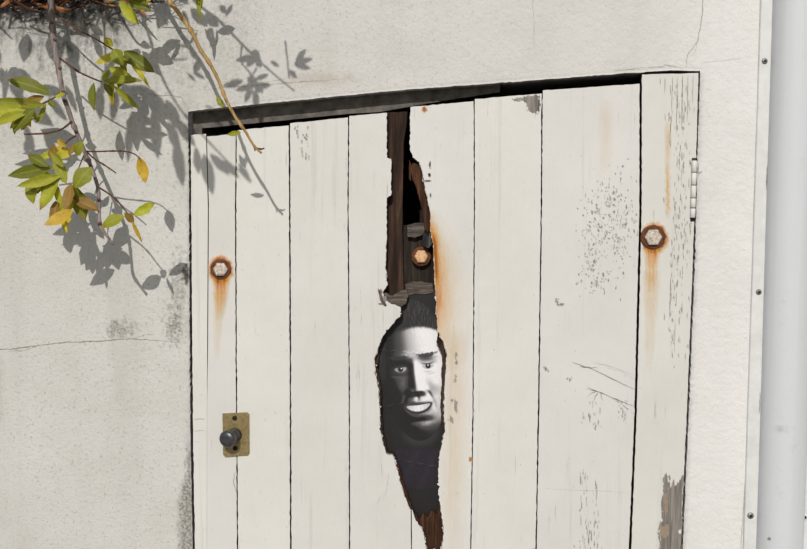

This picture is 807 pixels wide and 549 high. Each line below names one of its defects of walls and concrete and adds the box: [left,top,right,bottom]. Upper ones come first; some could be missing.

peeling [512,94,541,114]
rust [643,223,668,266]
rust [209,256,233,299]
rust [431,228,442,313]
peeling [658,473,685,549]